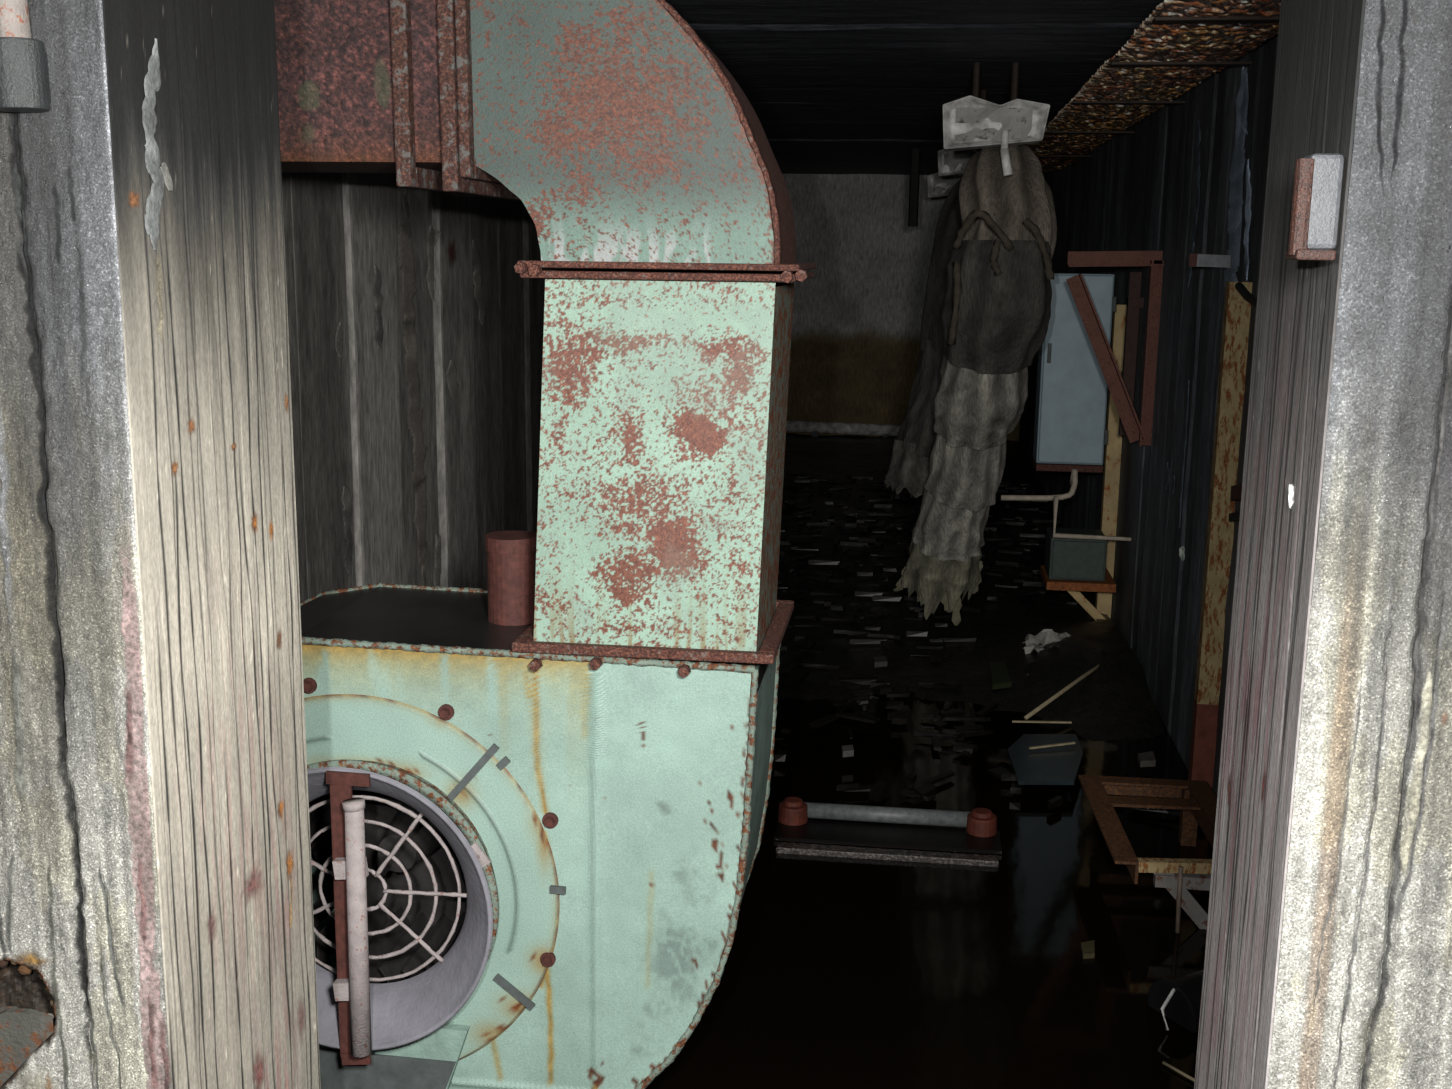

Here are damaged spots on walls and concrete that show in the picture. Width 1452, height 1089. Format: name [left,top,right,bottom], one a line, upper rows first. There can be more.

leakage [0,433,9,592]
crack [9,112,124,1089]
crack [1315,310,1452,1089]